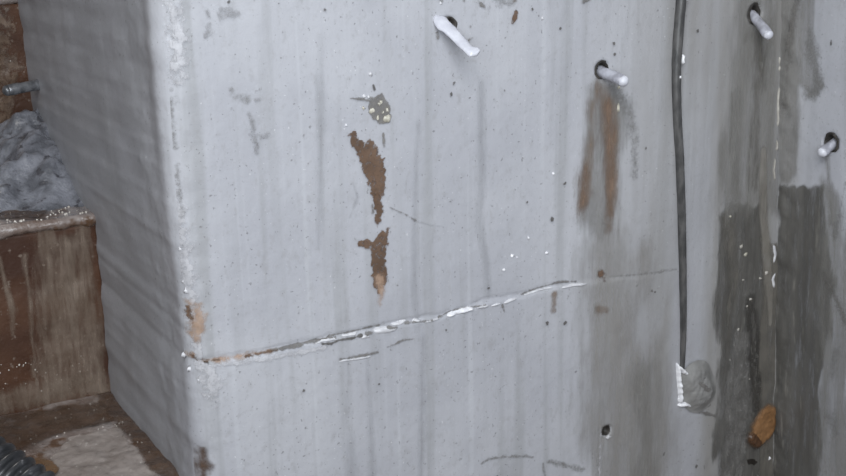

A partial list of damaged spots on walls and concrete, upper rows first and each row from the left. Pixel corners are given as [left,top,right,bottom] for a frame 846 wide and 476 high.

rust [580,84,634,229]
damp [713,0,846,476]
crack [208,281,587,367]